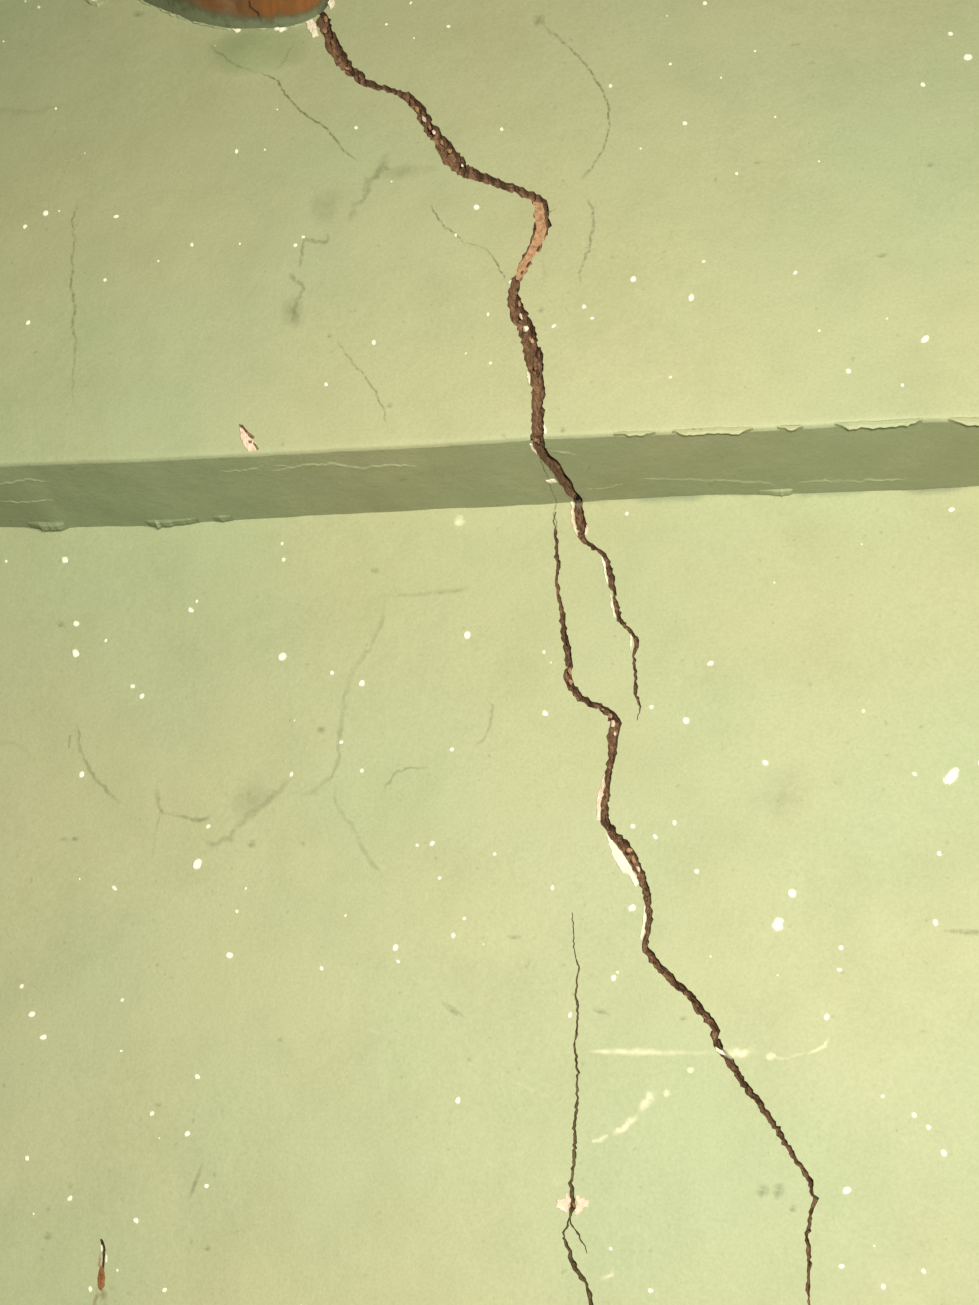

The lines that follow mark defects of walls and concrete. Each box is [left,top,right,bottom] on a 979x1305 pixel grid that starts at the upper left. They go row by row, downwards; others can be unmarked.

spalling [239,424,259,452]
crack [316,12,819,1305]
corrosion [97,1266,106,1291]